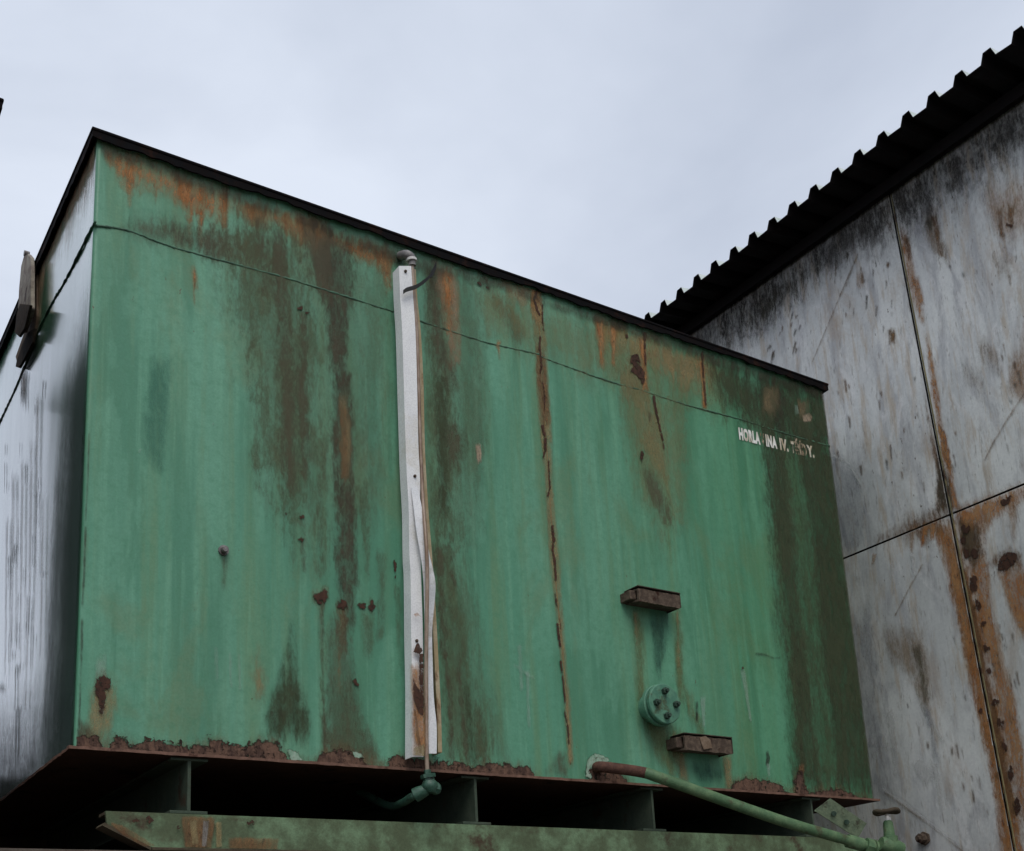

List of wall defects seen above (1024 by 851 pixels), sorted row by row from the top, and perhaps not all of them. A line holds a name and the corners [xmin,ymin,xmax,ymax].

rust [107,154,394,286]
damp [697,104,1024,345]
rust [596,321,717,504]
rust [91,675,112,731]
rust [313,588,376,645]
rust [412,643,425,756]
damp [718,372,871,791]
rust [888,344,1024,851]